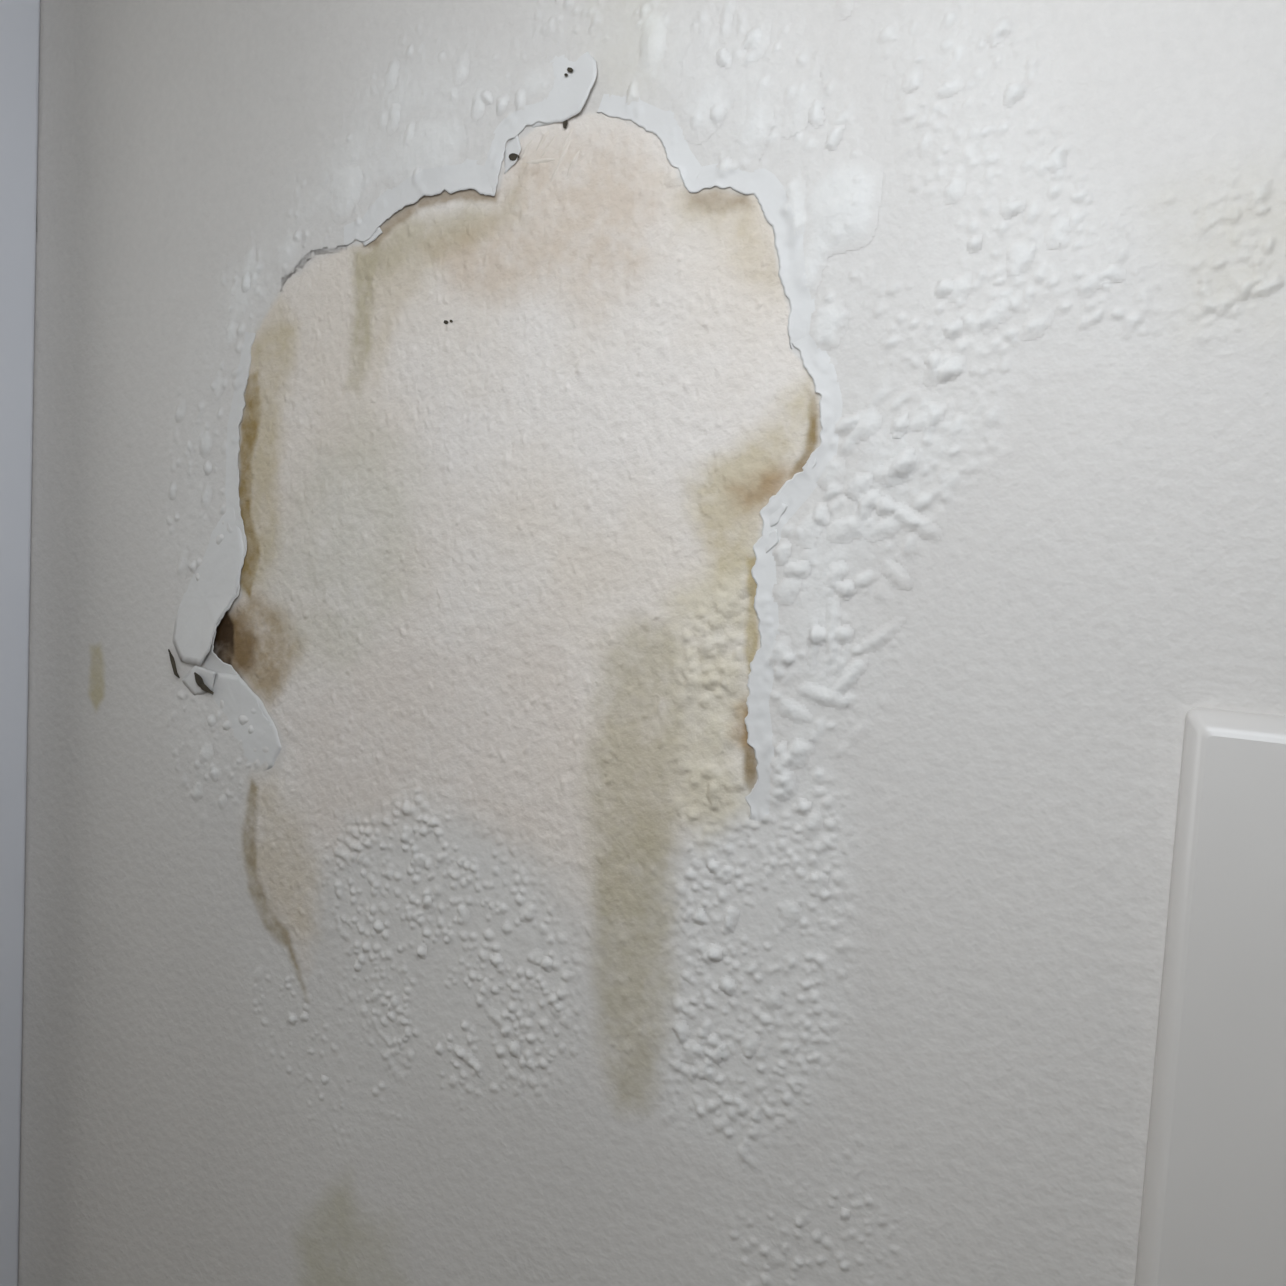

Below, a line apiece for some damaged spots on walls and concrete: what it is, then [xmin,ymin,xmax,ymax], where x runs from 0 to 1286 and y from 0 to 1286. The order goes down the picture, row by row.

peeling [172,332,282,771]
leakage [213,0,822,1126]
peeling [280,52,843,824]